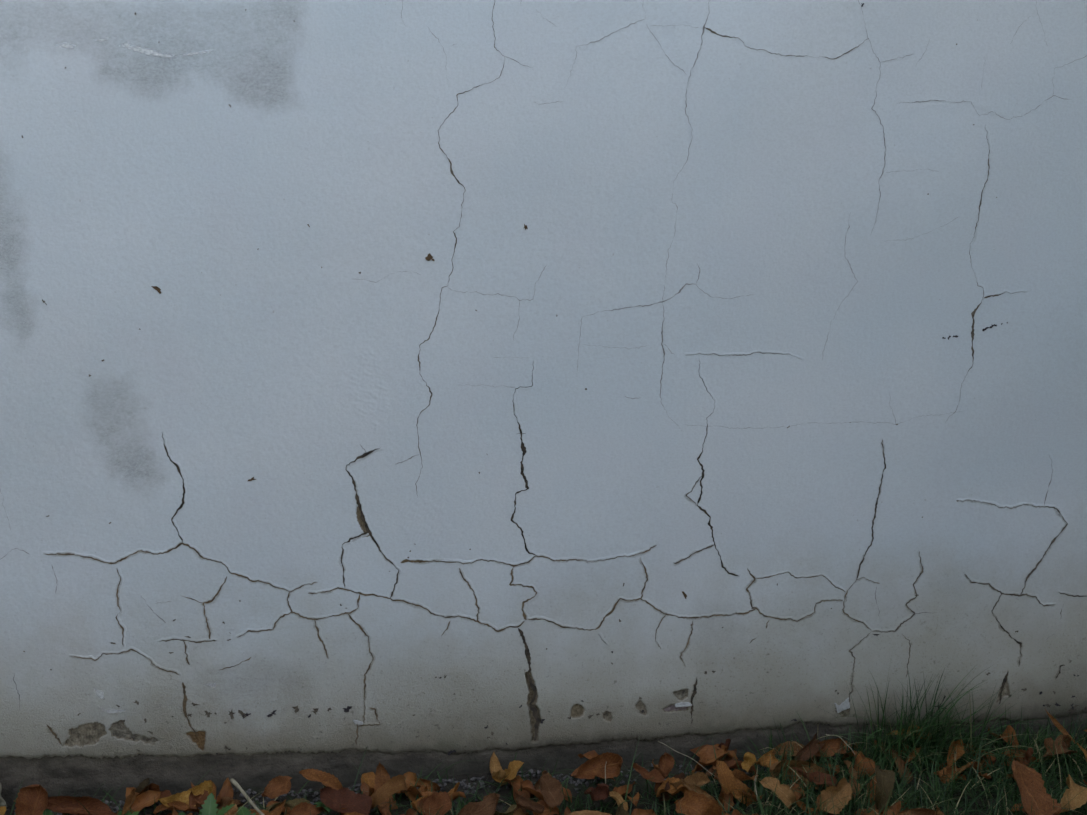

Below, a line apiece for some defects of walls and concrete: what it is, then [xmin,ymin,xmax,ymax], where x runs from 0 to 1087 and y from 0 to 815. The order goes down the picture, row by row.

crack [900,55,1087,425]
crack [1,0,939,746]
flaking render [66,713,157,751]
flaking render [568,700,611,720]
flaking render [664,689,692,712]
crack [957,453,1087,704]